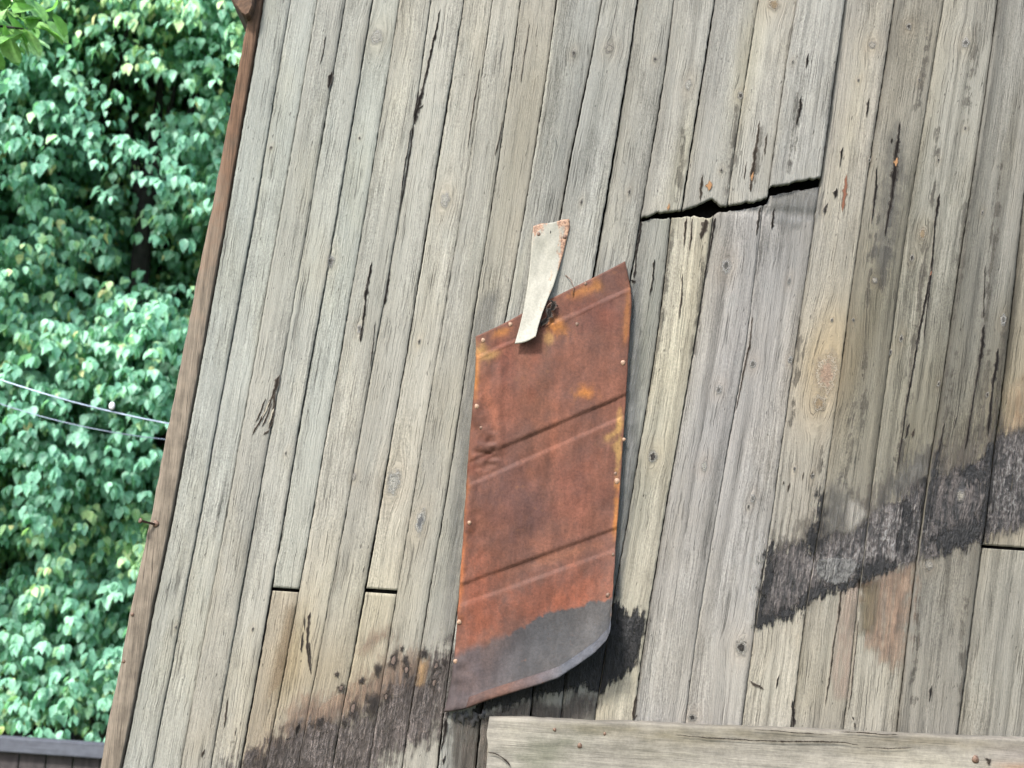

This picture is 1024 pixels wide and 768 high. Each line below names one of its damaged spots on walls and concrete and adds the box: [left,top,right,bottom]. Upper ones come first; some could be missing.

crack [631,121,843,319]
crack [736,317,753,408]
leakage [954,464,986,487]
leakage [756,541,779,617]
leakage [857,463,924,582]
leakage [930,517,983,556]